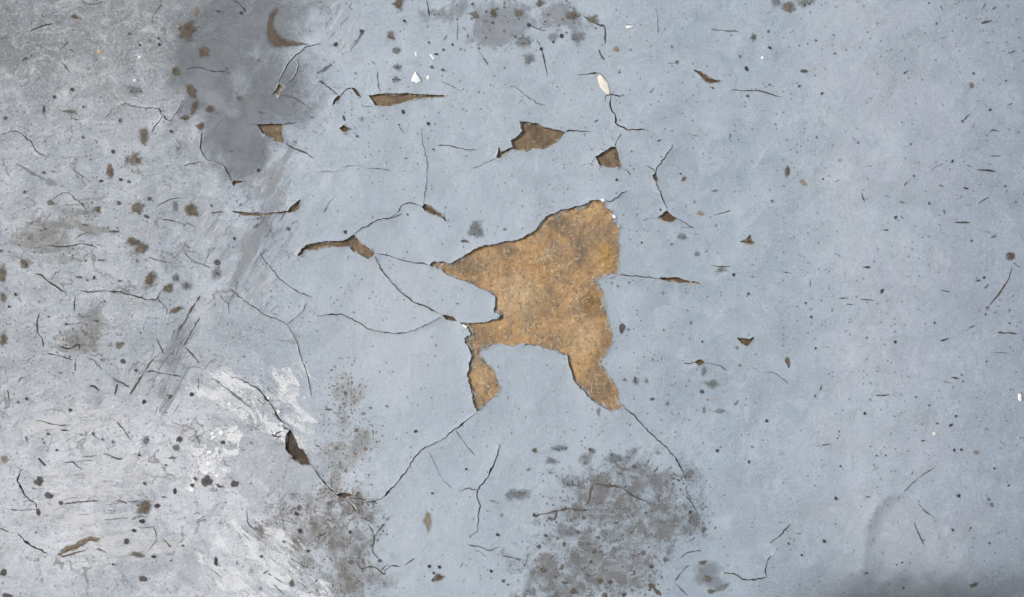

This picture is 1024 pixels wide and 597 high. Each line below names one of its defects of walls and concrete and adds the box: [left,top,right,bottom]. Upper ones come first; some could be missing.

peeling [352,41,453,125]
water stain [174,0,298,310]
crack [355,131,492,234]
peeling [496,120,565,158]
peeling [595,147,622,181]
crack [582,94,698,235]
peeling [297,230,374,259]
crack [148,252,441,394]
peeling [428,198,630,412]
crack [233,376,288,437]
spalling [284,428,311,466]
crack [310,413,500,535]